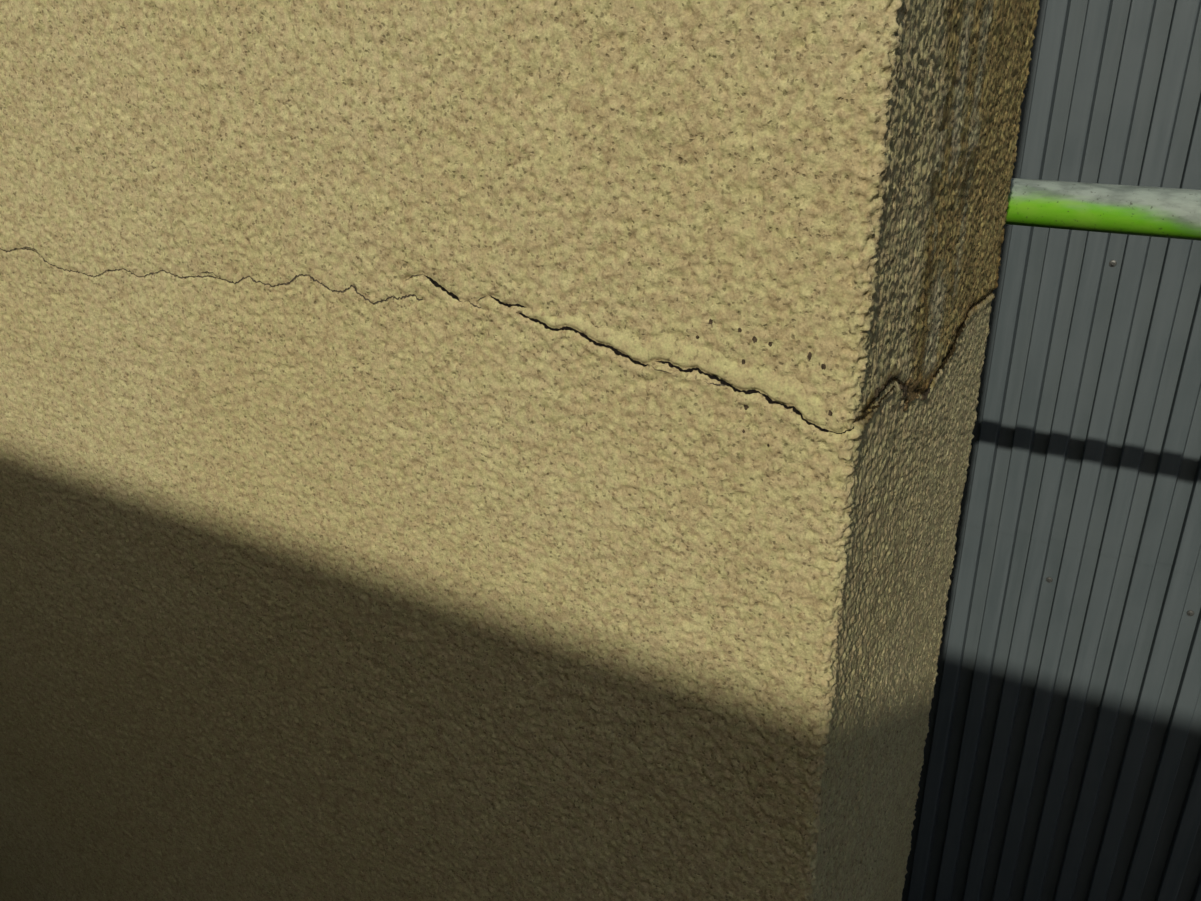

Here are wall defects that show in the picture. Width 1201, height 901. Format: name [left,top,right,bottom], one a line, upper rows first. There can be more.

crack [1,246,993,434]